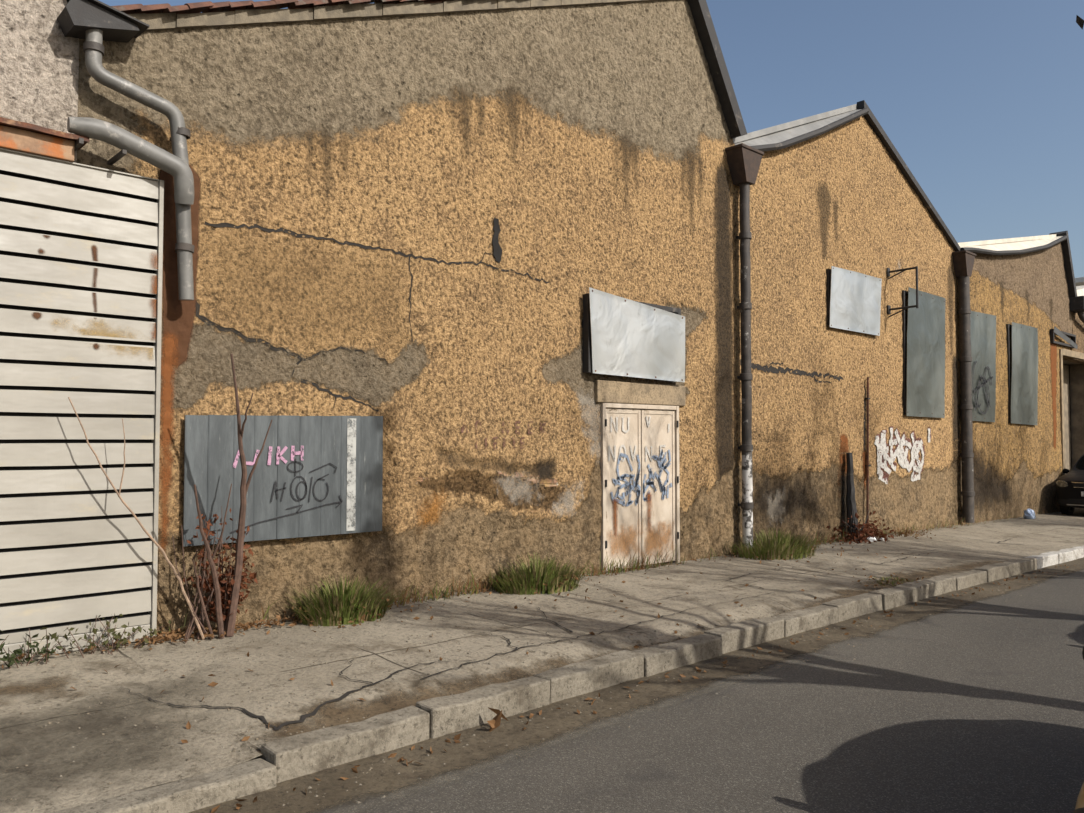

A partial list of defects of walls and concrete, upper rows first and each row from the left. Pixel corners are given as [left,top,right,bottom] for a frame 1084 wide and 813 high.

rust [92,246,118,349]
rust [132,165,201,549]
crack [196,301,388,412]
crack [204,221,549,342]
flaking render [156,456,607,633]
rust [613,493,671,552]